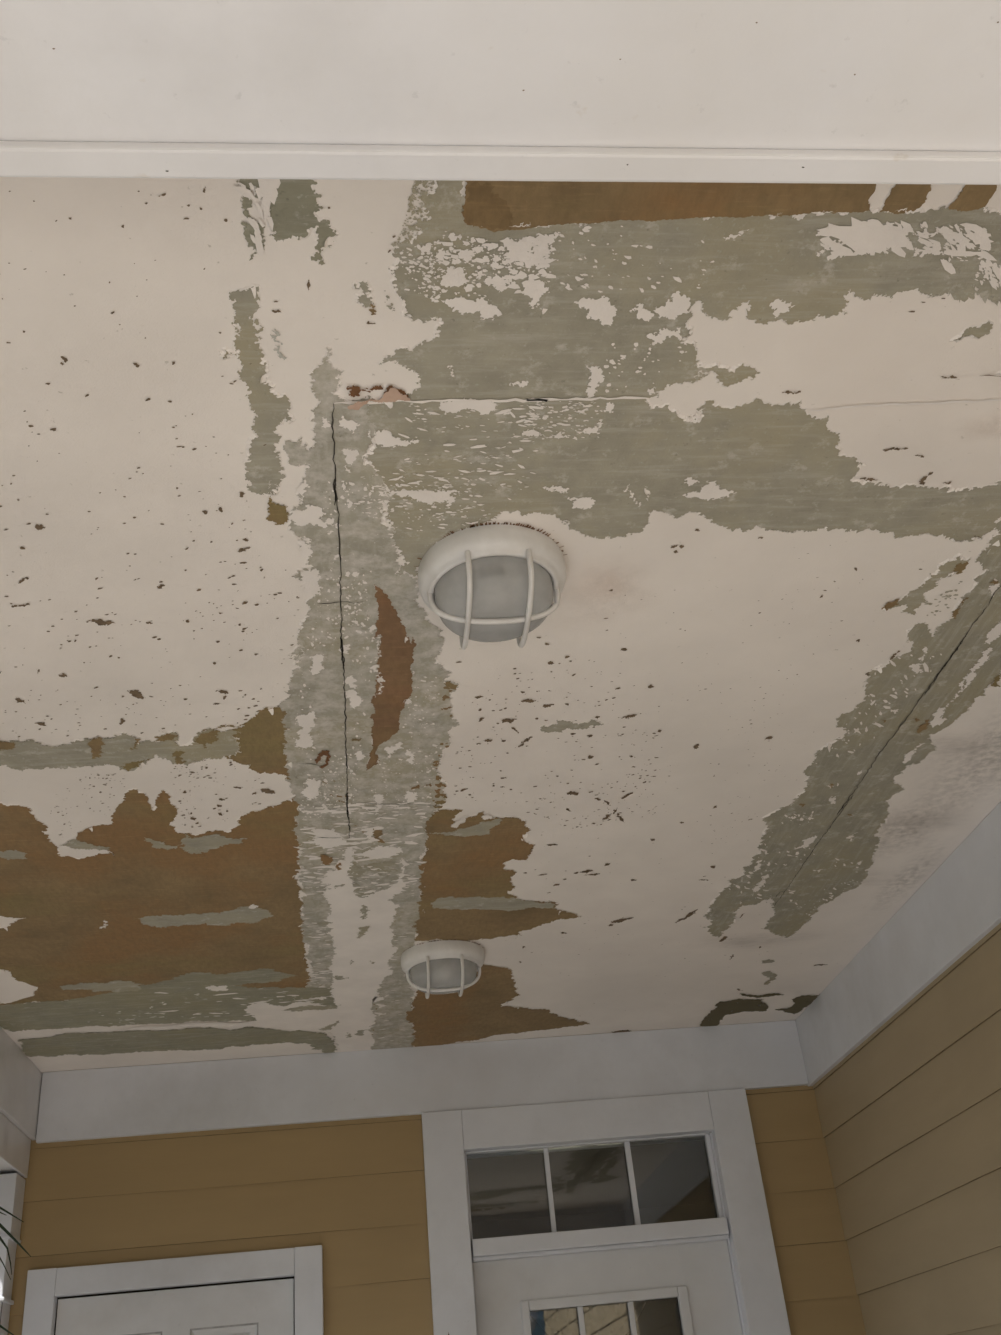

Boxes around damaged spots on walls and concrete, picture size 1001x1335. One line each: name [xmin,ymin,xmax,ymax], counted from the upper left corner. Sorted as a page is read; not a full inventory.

peeling [47,611,116,663]
peeling [101,683,190,734]
crack [313,403,443,838]
peeling [171,179,1001,1052]
crack [774,586,1001,906]